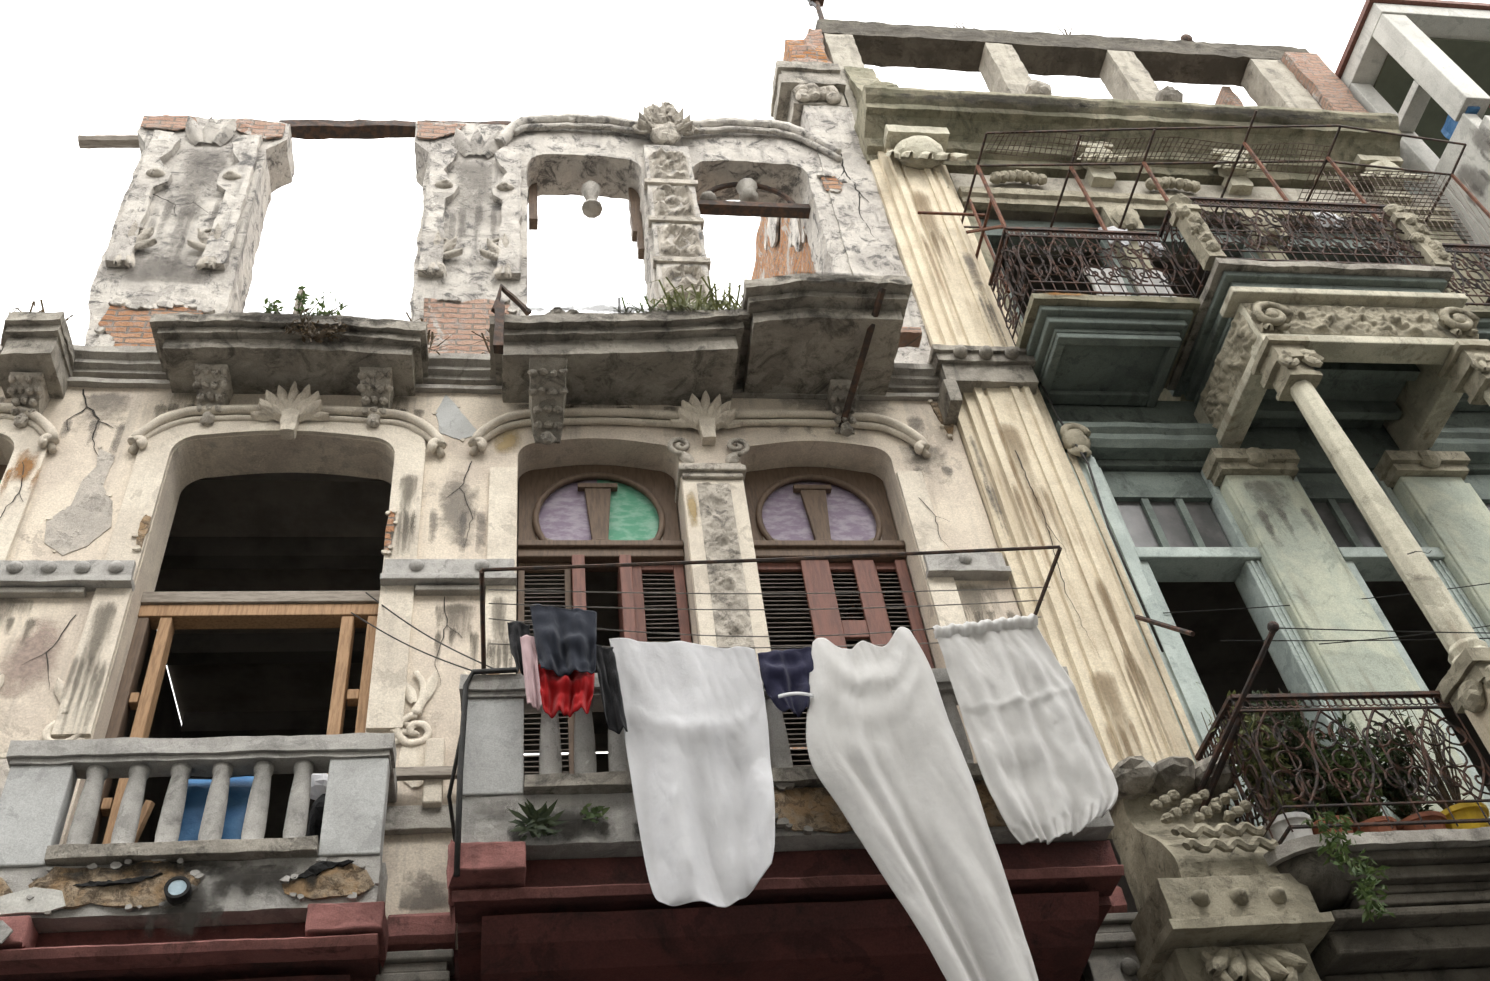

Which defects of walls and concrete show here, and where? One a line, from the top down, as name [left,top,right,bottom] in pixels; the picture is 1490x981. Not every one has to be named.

flaking render [764,217,814,262]
crack [67,389,113,455]
peeling [44,446,115,556]
spalling [381,509,398,556]
crack [447,461,473,547]
damp [960,585,1013,622]
damp [1099,585,1119,634]
crack [24,615,76,687]
damp [1107,658,1158,756]
spalling [0,858,205,916]
spalling [280,857,379,901]